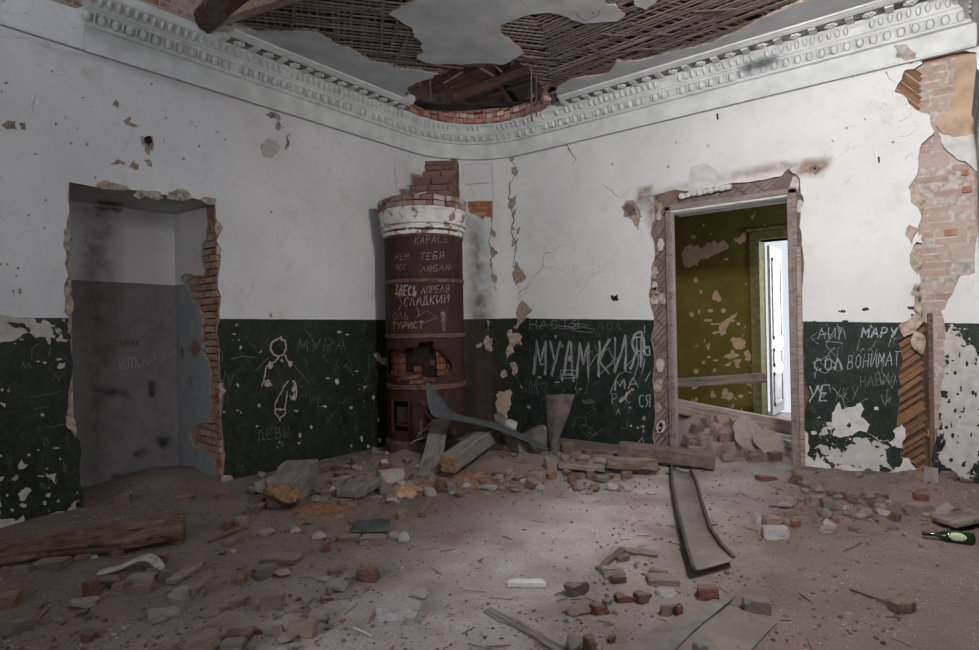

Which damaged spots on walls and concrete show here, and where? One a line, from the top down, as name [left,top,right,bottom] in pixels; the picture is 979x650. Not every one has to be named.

flaking render [198,0,796,124]
flaking render [1,121,26,130]
crack [463,157,563,329]
flaking render [621,200,642,230]
peeling [0,283,74,345]
flaking render [94,176,239,482]
flaking render [630,169,804,446]
flaking render [803,321,818,407]
peeling [0,449,39,528]
flaking render [66,415,77,438]
peeling [792,431,863,478]
peeling [831,403,879,437]